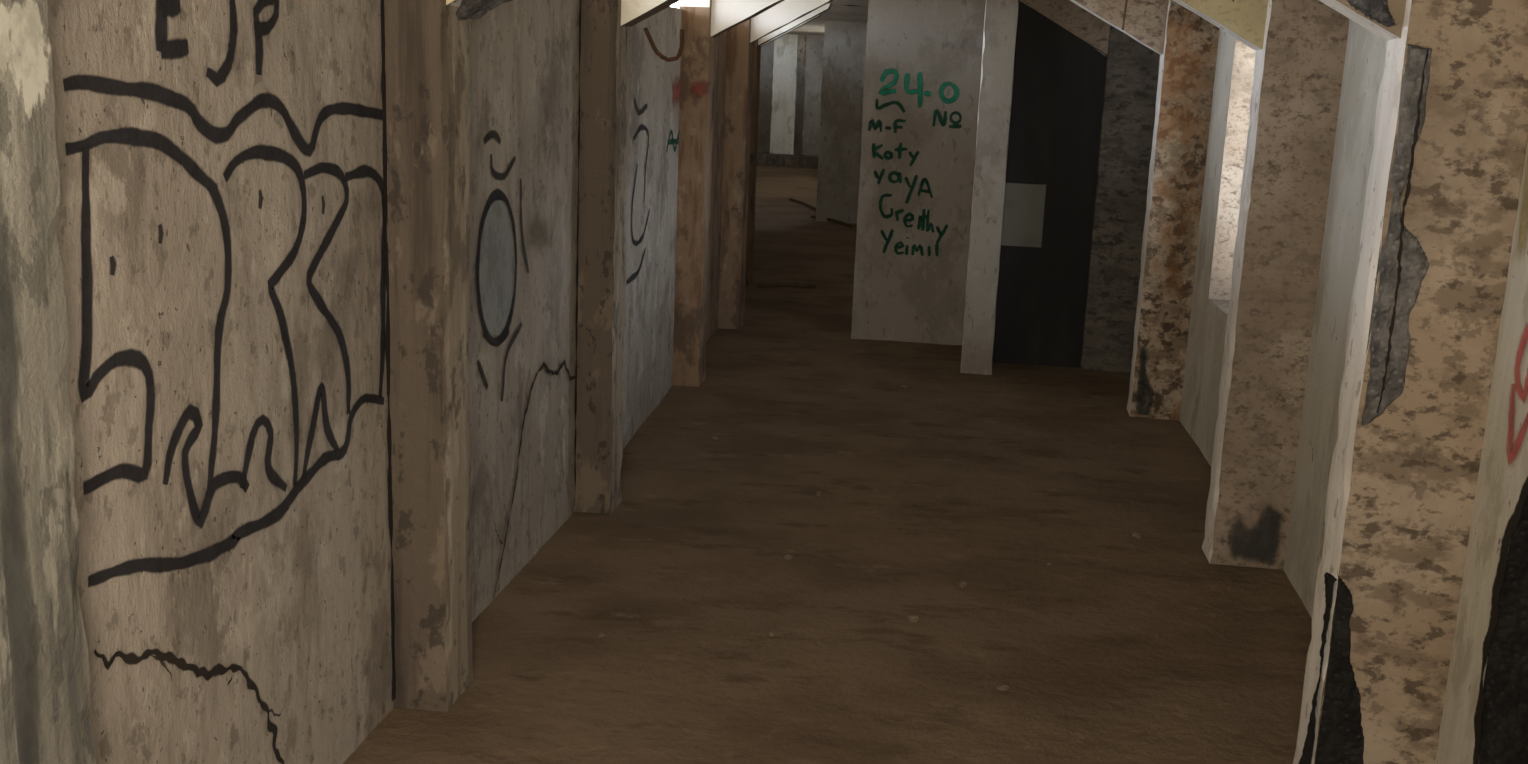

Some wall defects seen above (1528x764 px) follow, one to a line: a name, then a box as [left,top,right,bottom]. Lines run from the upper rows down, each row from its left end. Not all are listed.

peeling [0,0,51,119]
spalling [449,0,513,20]
spalling [1345,0,1397,27]
spalling [1361,44,1432,425]
crack [94,649,285,764]
spalling [1298,572,1364,764]
spalling [1473,477,1528,764]